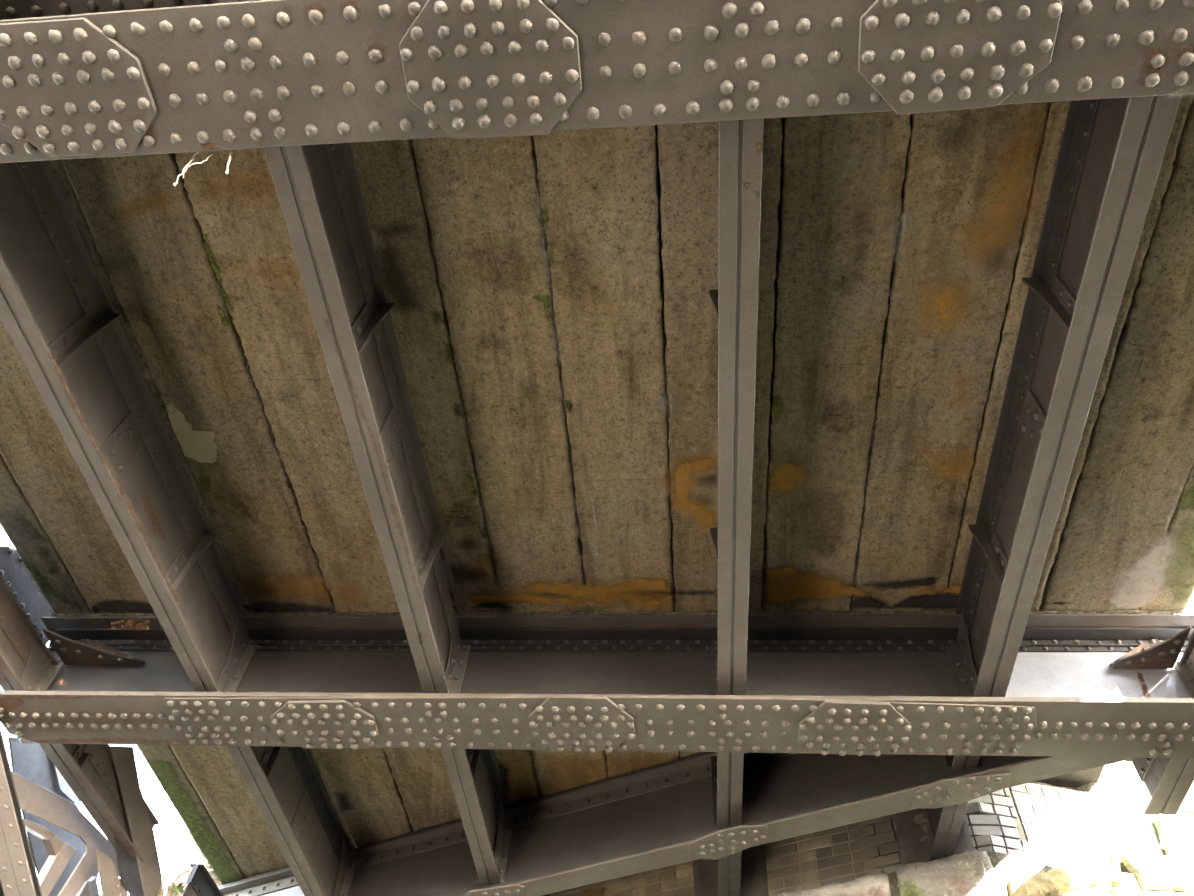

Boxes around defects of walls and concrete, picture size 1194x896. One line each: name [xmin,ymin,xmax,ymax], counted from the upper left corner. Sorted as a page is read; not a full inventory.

corrosion [1138,673,1150,698]